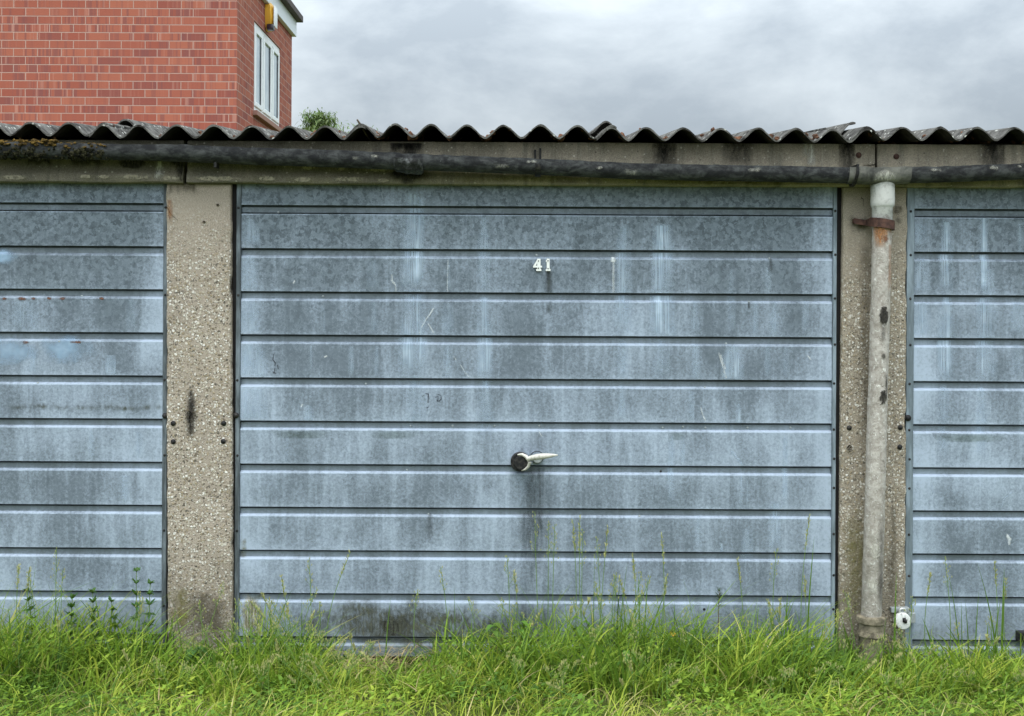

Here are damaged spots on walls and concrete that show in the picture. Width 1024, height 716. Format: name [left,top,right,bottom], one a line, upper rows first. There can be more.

water stain [391,170,423,366]
water stain [654,225,670,334]
water stain [186,390,195,431]